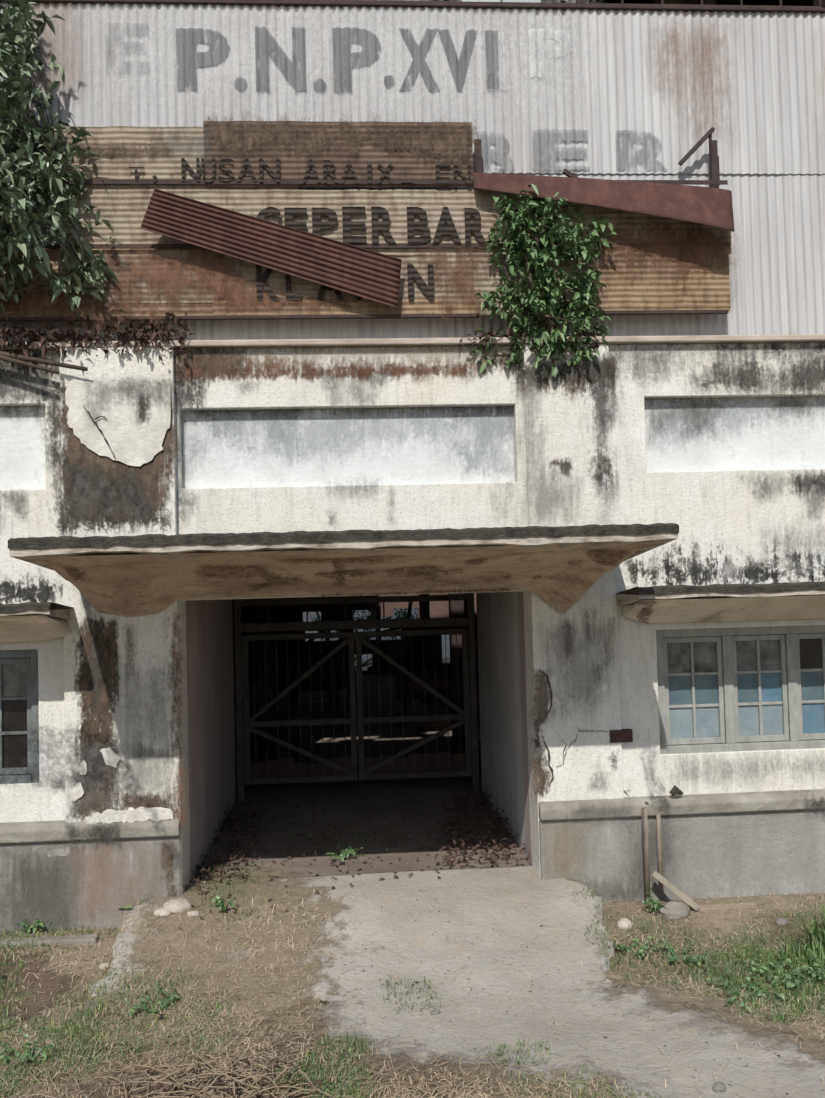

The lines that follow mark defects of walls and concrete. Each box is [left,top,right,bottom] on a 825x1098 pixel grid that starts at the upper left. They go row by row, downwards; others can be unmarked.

leakage [0,350,130,535]
crack [83,406,117,462]
spalling [59,346,515,528]
leakage [257,343,675,489]
leakage [653,342,825,437]
leakage [792,475,825,513]
leakage [0,581,55,604]
leakage [629,545,728,586]
leakage [739,532,825,584]
spalling [69,618,173,824]
spalling [531,671,551,796]
crack [539,670,606,787]